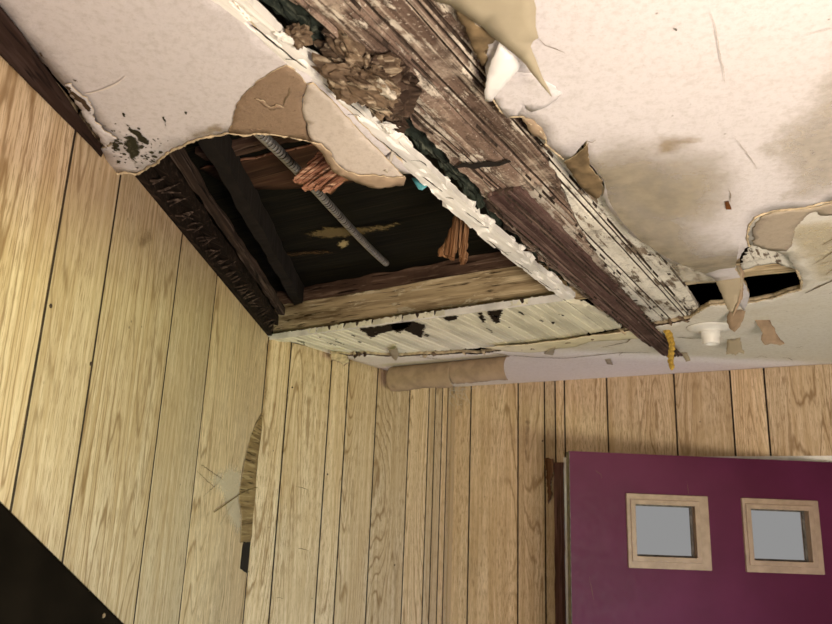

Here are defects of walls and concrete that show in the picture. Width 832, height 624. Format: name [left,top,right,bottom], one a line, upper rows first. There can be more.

peeling [433,0,552,97]
peeling [65,83,117,148]
water stain [111,113,168,169]
peeling [229,65,312,141]
water stain [598,160,737,274]
peeling [752,203,832,251]
peeling [390,322,429,338]
peeling [335,329,638,361]
peeling [478,310,510,333]
spalling [651,303,725,331]